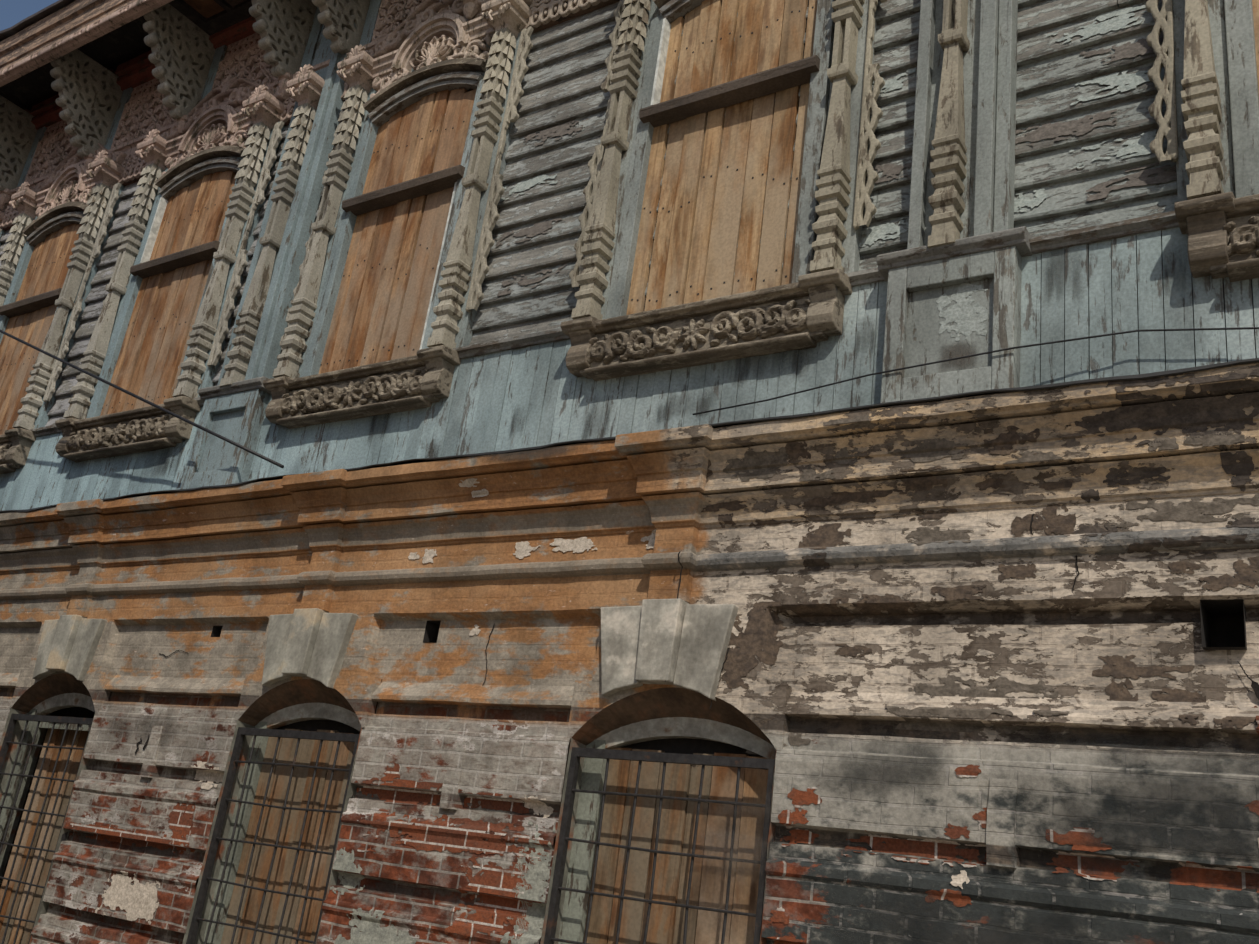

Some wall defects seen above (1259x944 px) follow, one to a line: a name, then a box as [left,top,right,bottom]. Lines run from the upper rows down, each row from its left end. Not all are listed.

peeling [706,414,968,507]
peeling [975,373,1259,590]
peeling [513,537,597,559]
peeling [798,523,851,571]
peeling [719,593,921,688]
peeling [885,675,1070,735]
peeling [1092,655,1256,735]
crack [1237,661,1259,735]
flaking render [354,763,556,944]
flaking render [778,787,822,847]
flaking render [843,807,987,907]
peeling [95,871,160,925]